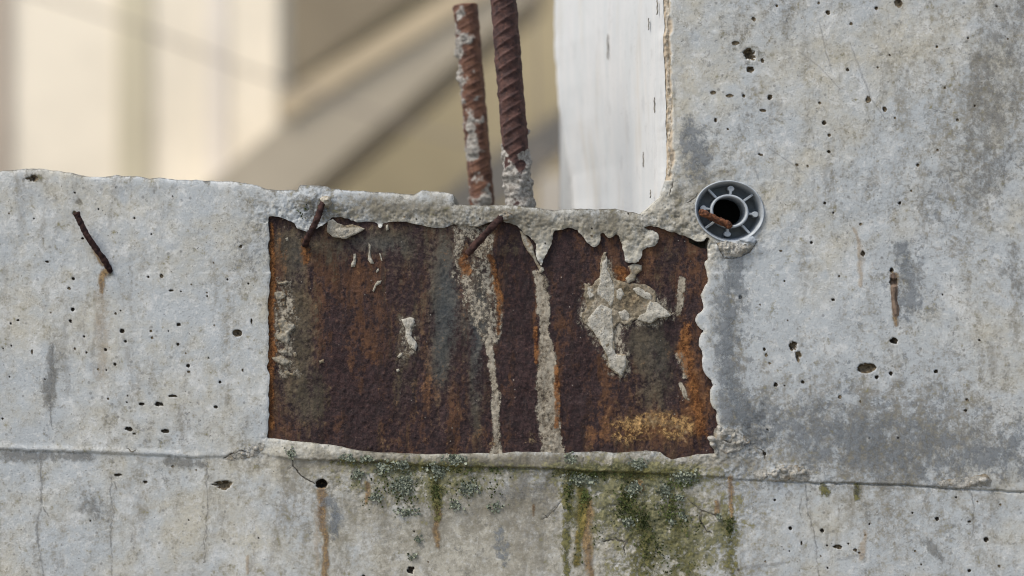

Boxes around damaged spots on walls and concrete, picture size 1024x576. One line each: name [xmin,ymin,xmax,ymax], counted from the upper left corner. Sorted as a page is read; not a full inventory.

corrosion [93,250,108,293]
peeling [327,219,364,239]
peeling [351,243,382,292]
peeling [520,231,544,273]
corrosion [267,223,277,429]
peeling [272,280,299,377]
peeling [396,317,417,372]
peeling [579,252,674,378]
corrosion [611,324,707,444]